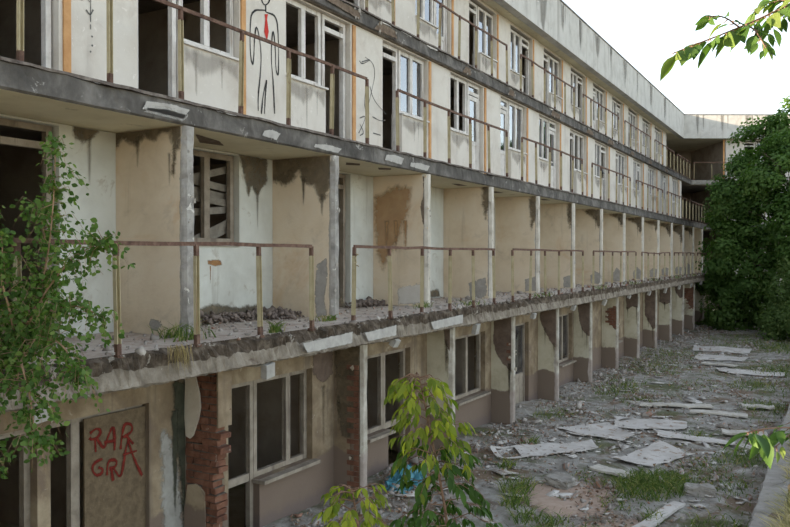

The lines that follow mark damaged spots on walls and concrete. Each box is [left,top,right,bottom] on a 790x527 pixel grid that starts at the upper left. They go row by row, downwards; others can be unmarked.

damp [73,127,98,148]
damp [116,126,181,174]
damp [239,154,330,207]
damp [375,187,410,264]
peeling [303,332,353,352]
damp [160,380,185,527]
flaking render [184,370,232,527]